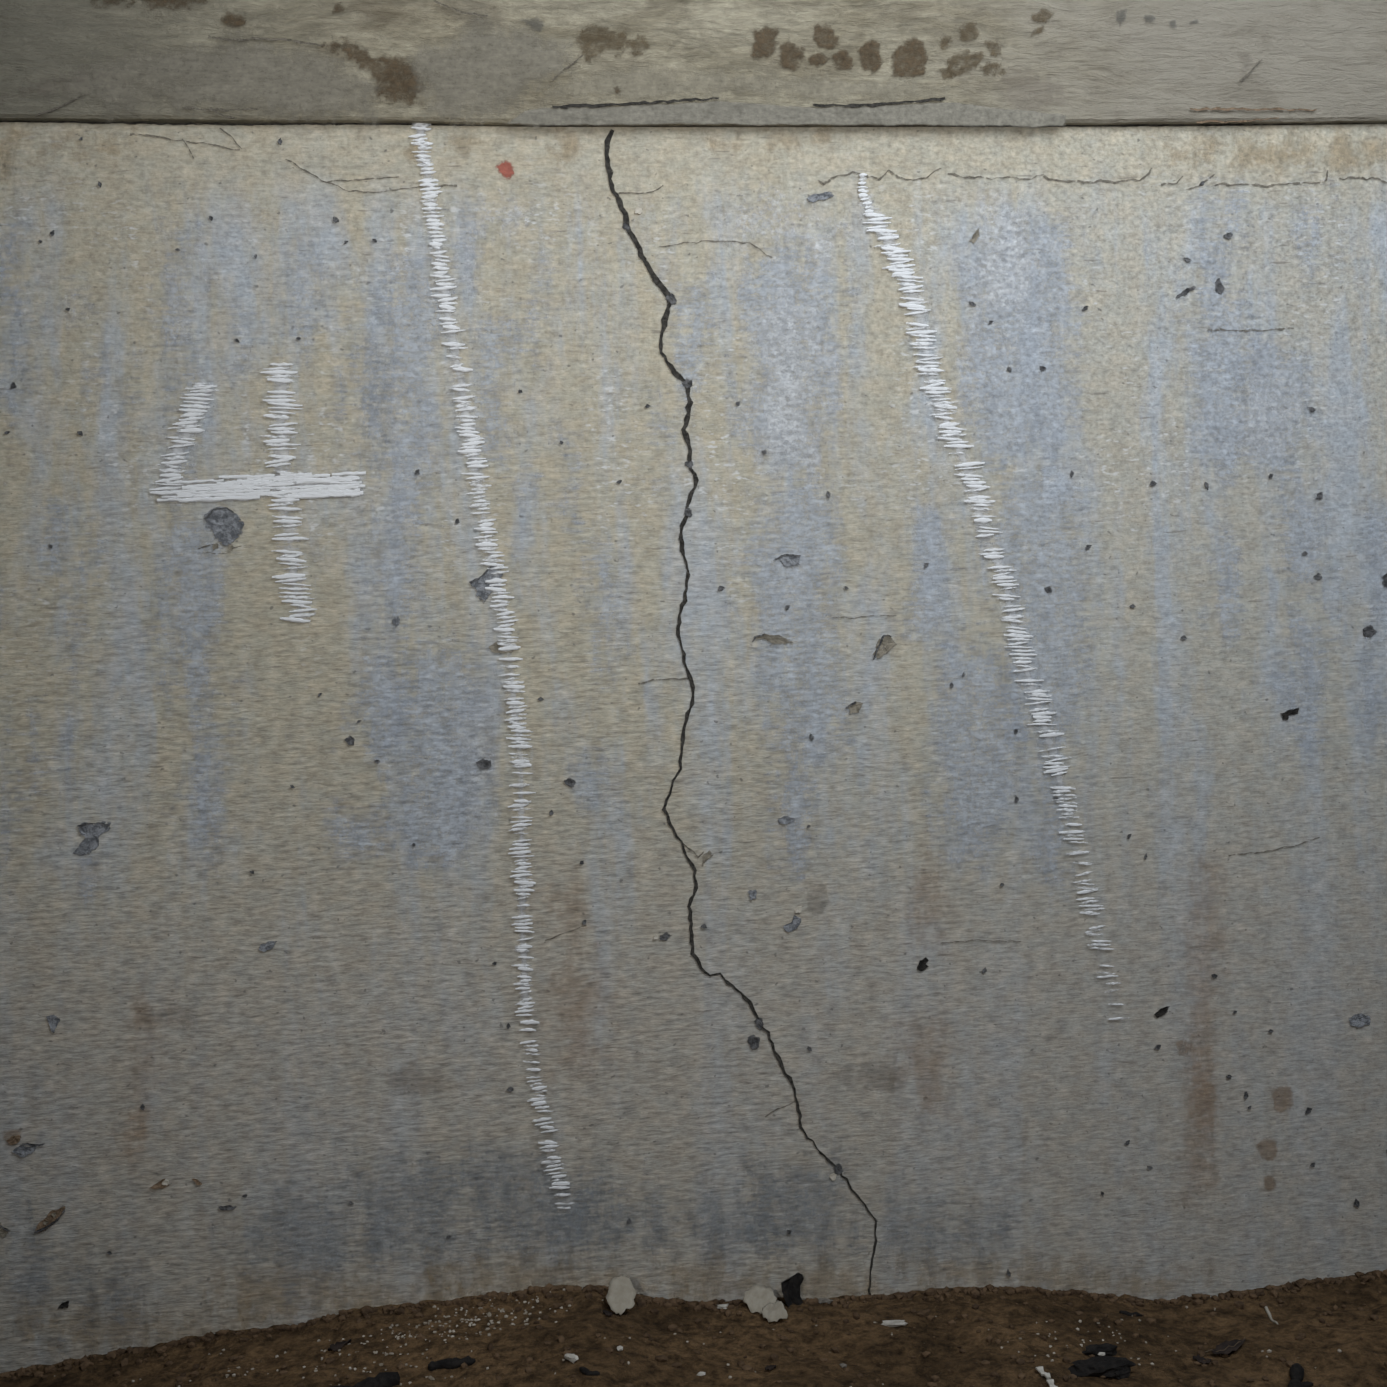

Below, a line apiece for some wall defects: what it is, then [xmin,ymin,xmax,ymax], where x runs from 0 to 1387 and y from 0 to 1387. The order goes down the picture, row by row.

water stain [357,259,440,616]
water stain [737,201,841,468]
water stain [958,204,1080,463]
water stain [1191,191,1311,482]
water stain [334,650,499,868]
crack [552,55,877,1295]
water stain [744,485,854,878]
water stain [939,469,1092,872]